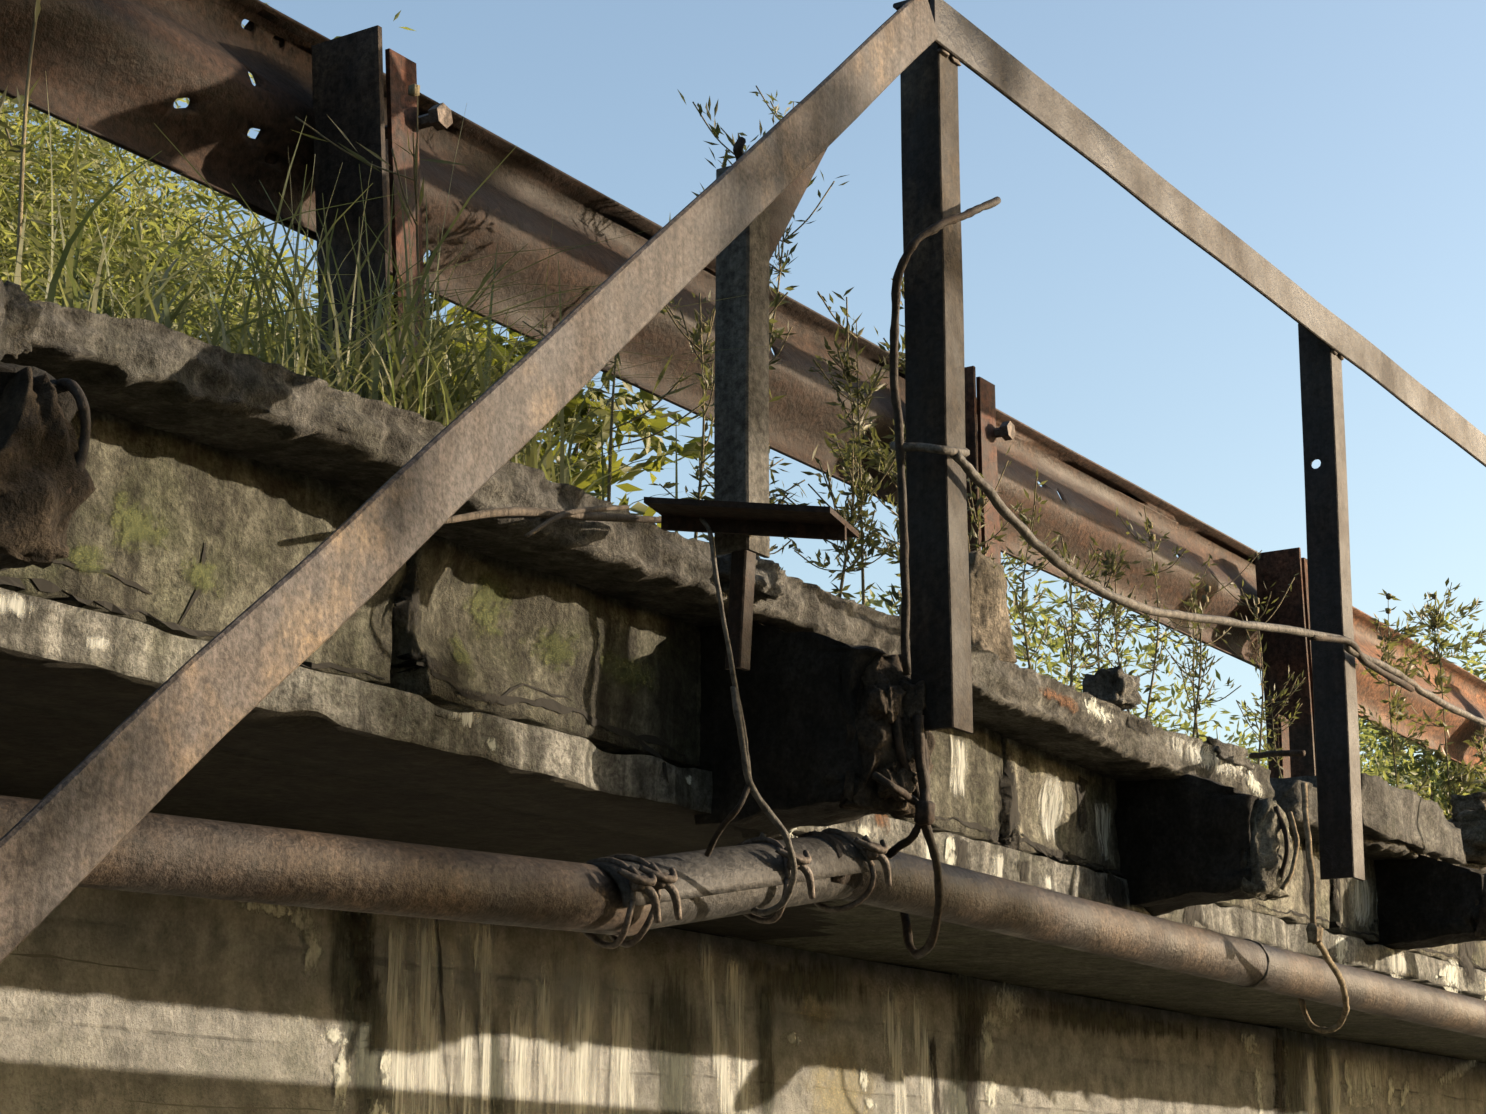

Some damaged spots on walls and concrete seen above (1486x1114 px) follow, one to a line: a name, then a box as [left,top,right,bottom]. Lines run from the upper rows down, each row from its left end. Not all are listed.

rust [875,814,890,829]
water stain [329,909,866,1114]
water stain [1016,1000,1198,1040]
water stain [882,972,989,1114]
water stain [860,1067,877,1108]